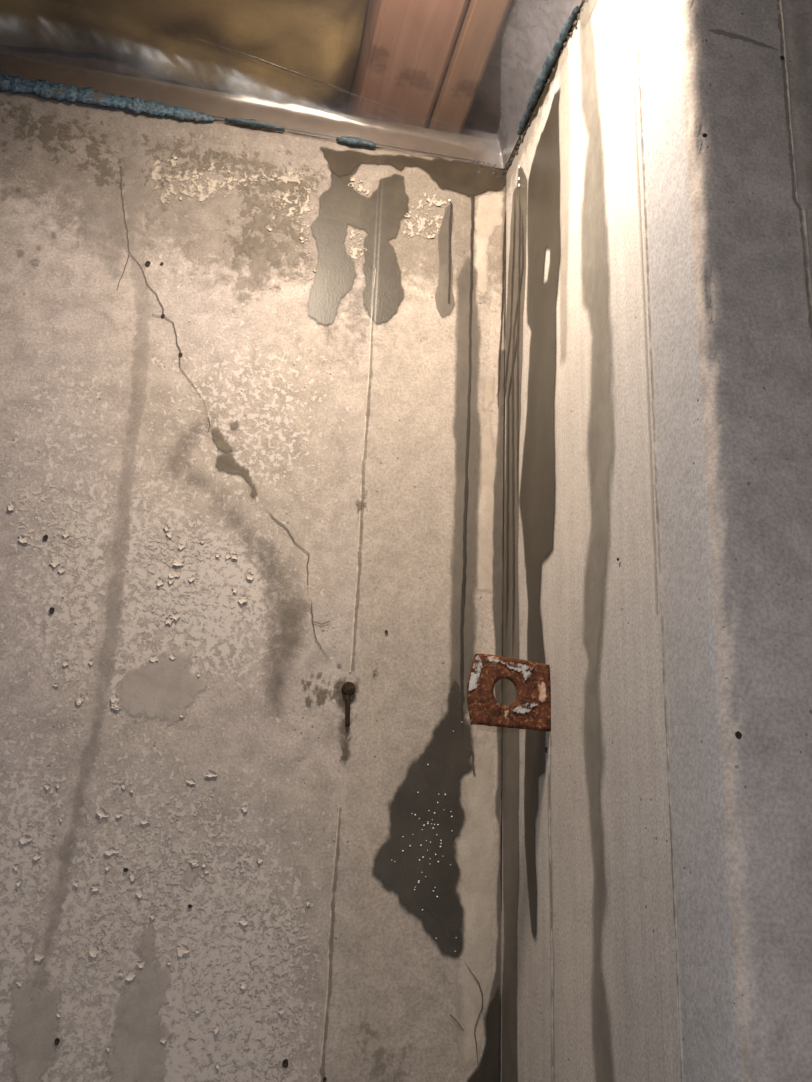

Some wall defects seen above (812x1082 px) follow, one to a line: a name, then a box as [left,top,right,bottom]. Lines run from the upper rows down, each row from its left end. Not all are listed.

crack [117,170,210,433]
leakage [1,89,560,1082]
crack [267,511,330,658]
leakage [580,0,614,1082]
rust [336,679,358,761]